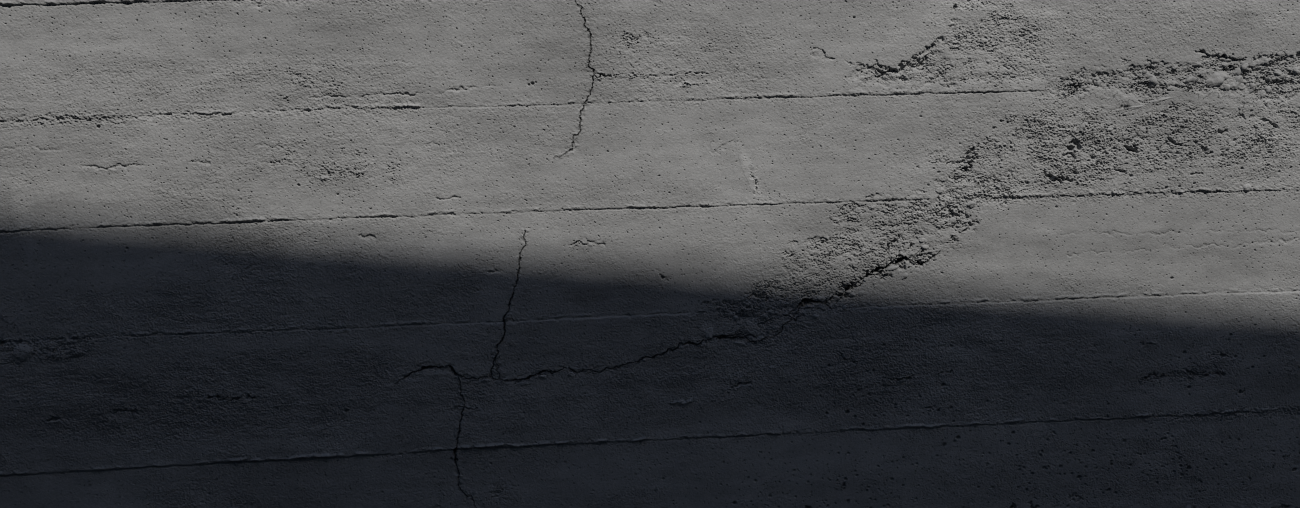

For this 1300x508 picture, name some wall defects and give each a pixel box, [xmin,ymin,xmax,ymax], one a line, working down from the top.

crack [553,0,595,159]
spalling [822,0,1300,110]
spalling [700,138,1019,338]
crack [393,230,941,508]